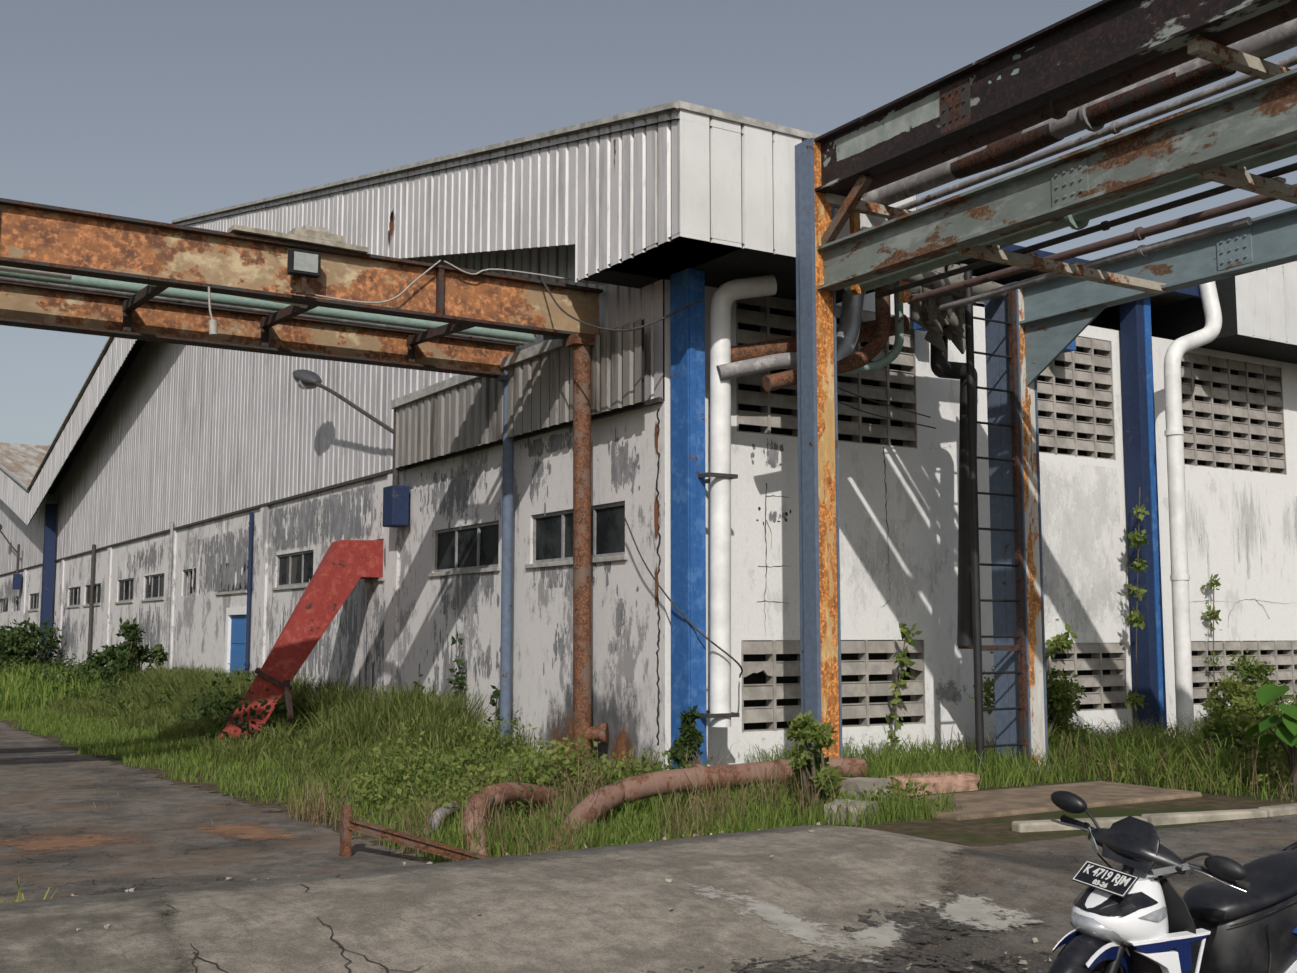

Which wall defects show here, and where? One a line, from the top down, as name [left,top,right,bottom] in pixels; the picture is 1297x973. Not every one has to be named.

peeling [970,47,1034,84]
peeling [823,91,940,167]
crack [299,883,420,973]
crack [190,943,229,973]
crack [737,947,838,973]